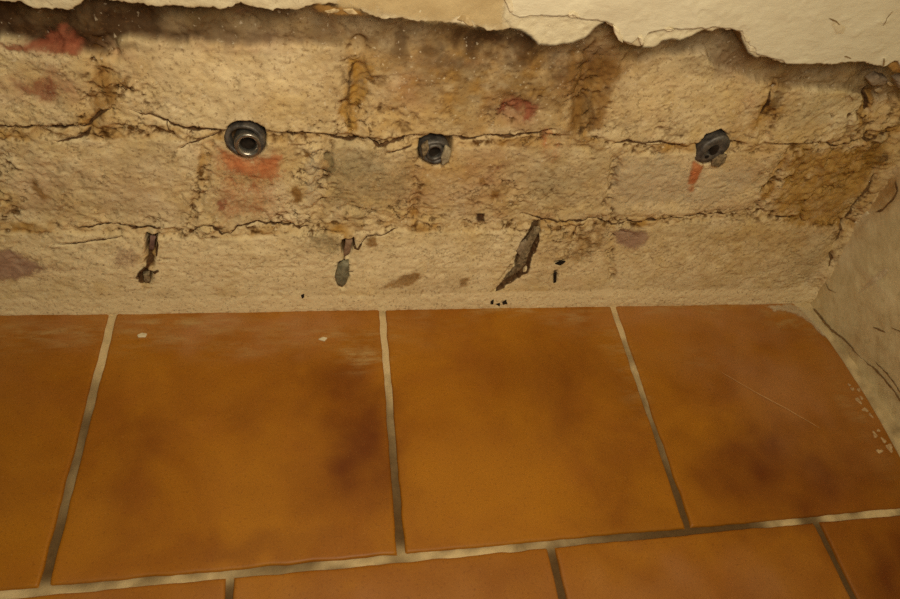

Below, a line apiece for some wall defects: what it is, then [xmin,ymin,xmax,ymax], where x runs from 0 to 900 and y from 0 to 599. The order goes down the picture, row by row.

crack [0,109,109,142]
crack [135,111,221,149]
crack [286,131,412,152]
crack [459,129,548,139]
crack [616,139,685,147]
spalling [0,0,900,316]
rust [689,162,703,191]
crack [65,222,134,244]
crack [190,220,334,235]
crack [525,211,738,235]